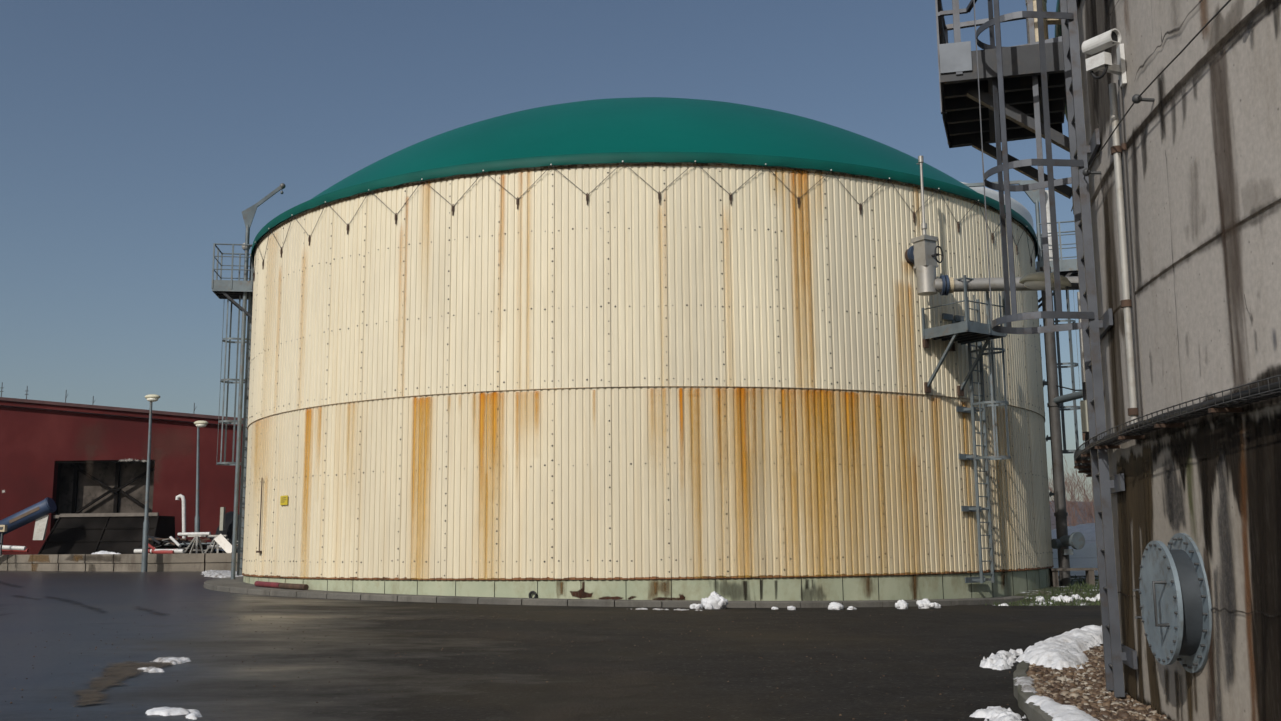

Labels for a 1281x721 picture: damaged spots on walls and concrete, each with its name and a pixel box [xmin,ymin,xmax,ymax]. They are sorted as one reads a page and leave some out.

corrosion [305,409,321,527]
corrosion [413,397,429,517]
corrosion [479,392,498,463]
corrosion [679,388,695,431]
corrosion [718,388,755,515]
corrosion [781,389,831,496]
corrosion [845,392,858,479]
damp [1085,0,1281,721]